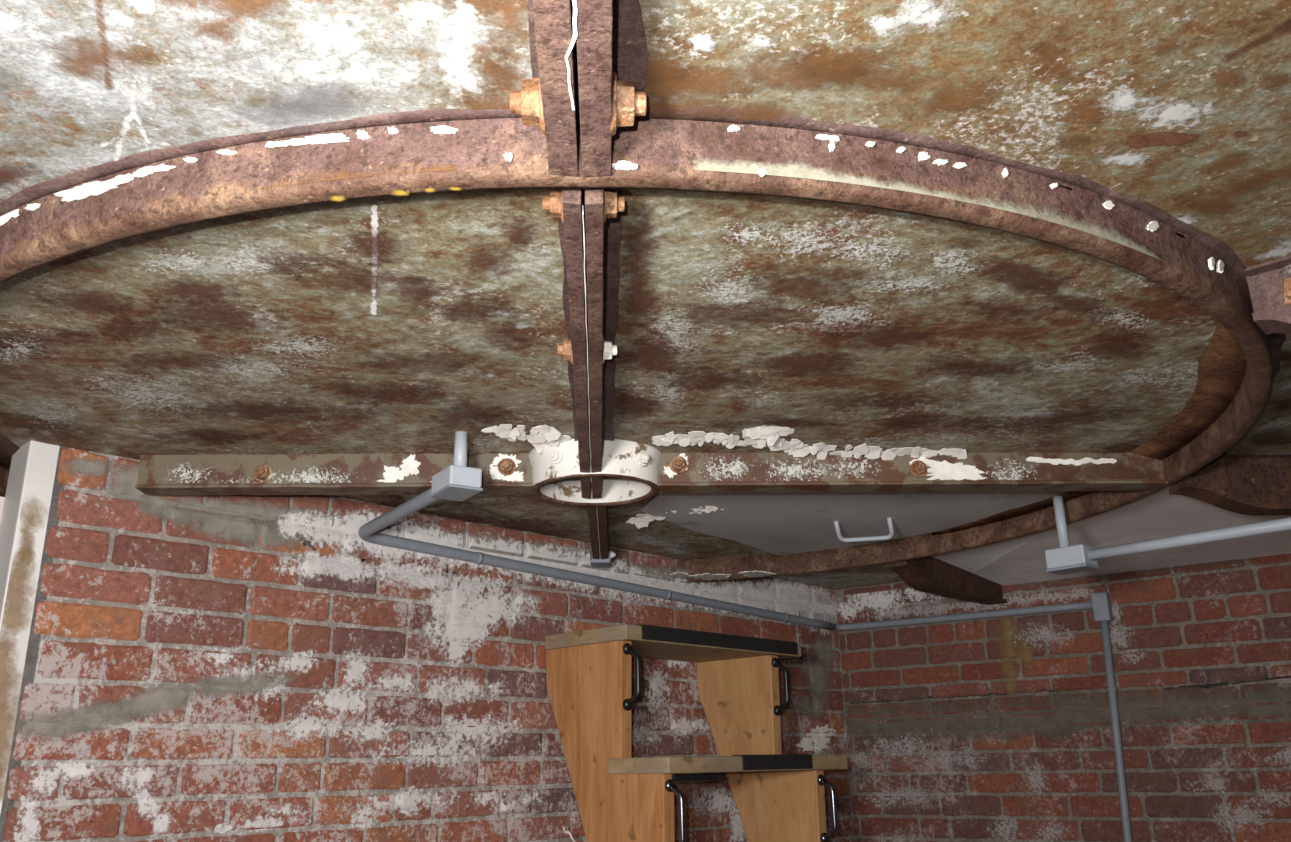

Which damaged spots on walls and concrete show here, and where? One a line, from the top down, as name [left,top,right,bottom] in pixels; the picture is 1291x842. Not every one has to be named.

peeling [55,157,198,202]
peeling [695,160,1156,258]
rust [260,232,432,302]
rust [38,283,262,340]
rust [714,417,832,428]
peeling [481,424,572,482]
peeling [652,425,1117,481]
rust [419,503,582,538]
water stain [266,509,1094,769]
water stain [207,647,326,702]
water stain [14,759,96,842]
water stain [311,786,541,842]